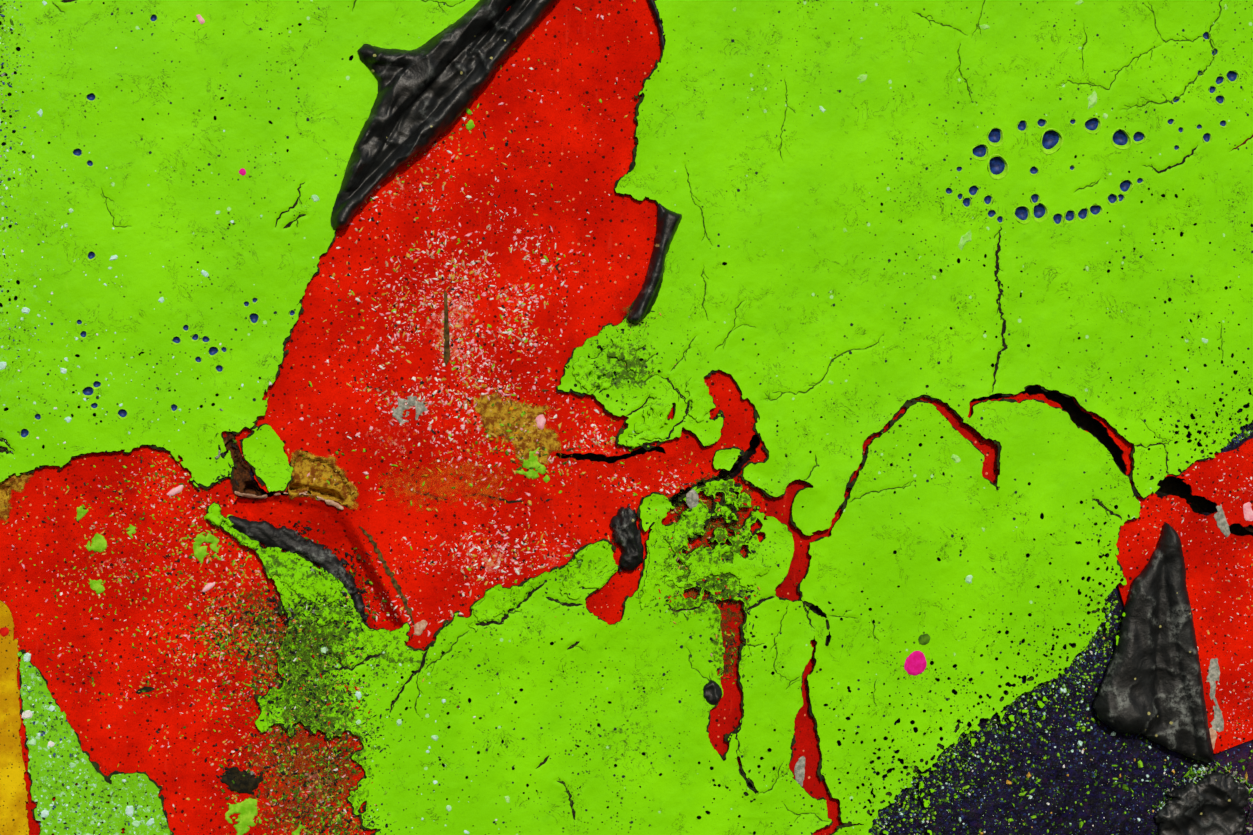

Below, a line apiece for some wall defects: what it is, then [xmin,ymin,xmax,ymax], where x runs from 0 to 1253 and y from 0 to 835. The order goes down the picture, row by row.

peeling [0,0,794,835]
crack [666,226,1253,835]
peeling [1093,438,1253,835]